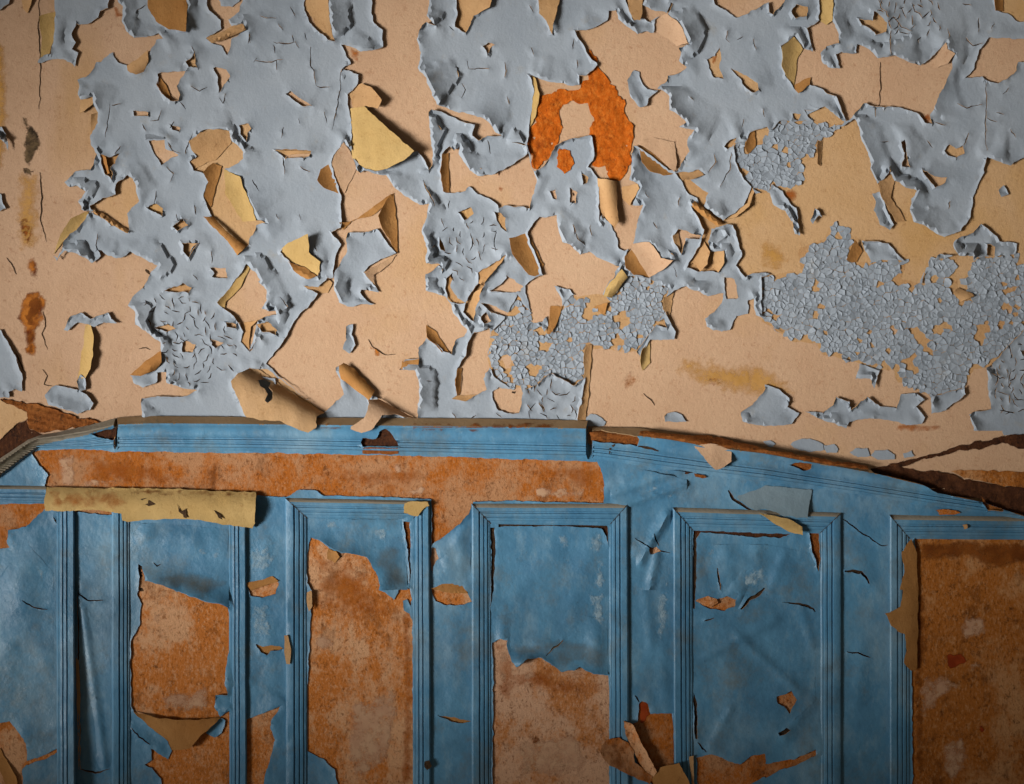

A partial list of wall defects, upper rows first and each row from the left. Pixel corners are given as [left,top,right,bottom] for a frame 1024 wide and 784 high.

crack [709,112,841,194]
rust [18,292,45,355]
crack [139,253,237,385]
crack [423,180,497,281]
peeling [0,0,1024,578]
crack [487,268,677,420]
crack [761,221,1024,414]
peeling [130,565,229,784]
peeling [307,538,413,784]
peeling [492,639,816,784]
peeling [885,509,1024,784]